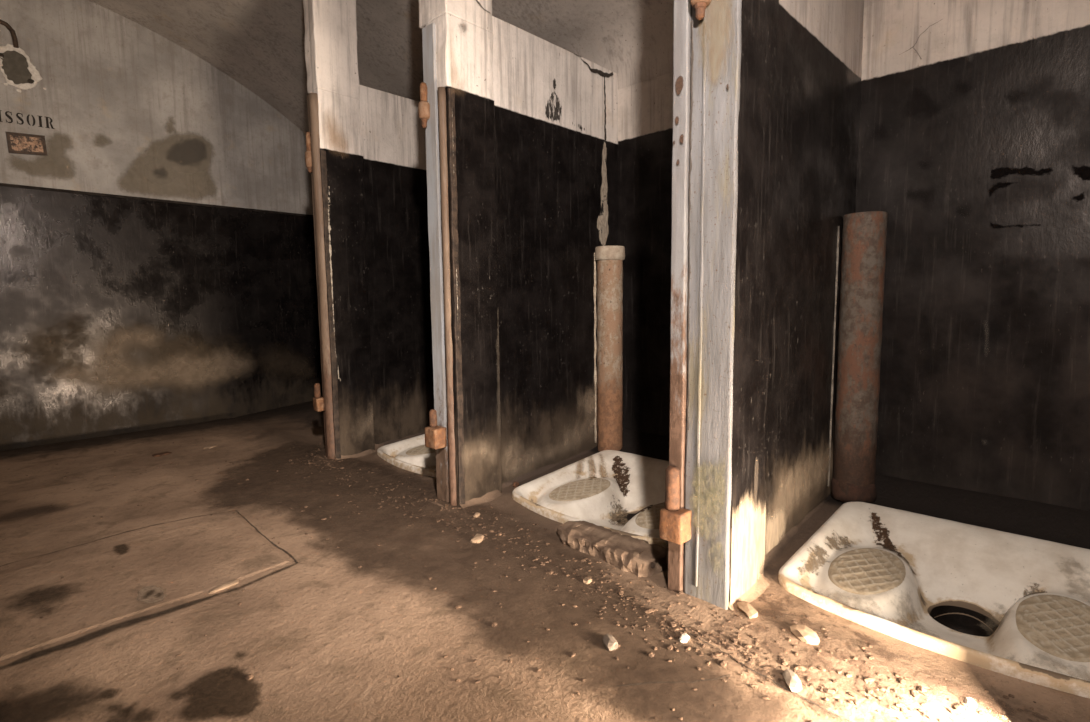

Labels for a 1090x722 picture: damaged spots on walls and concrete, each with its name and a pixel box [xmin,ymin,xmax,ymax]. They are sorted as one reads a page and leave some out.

spalling [0,44,46,93]
damp [12,135,73,177]
damp [120,119,216,198]
peeling [989,166,1052,195]
peeling [1073,166,1090,202]
damp [23,323,249,391]
damp [208,442,780,722]